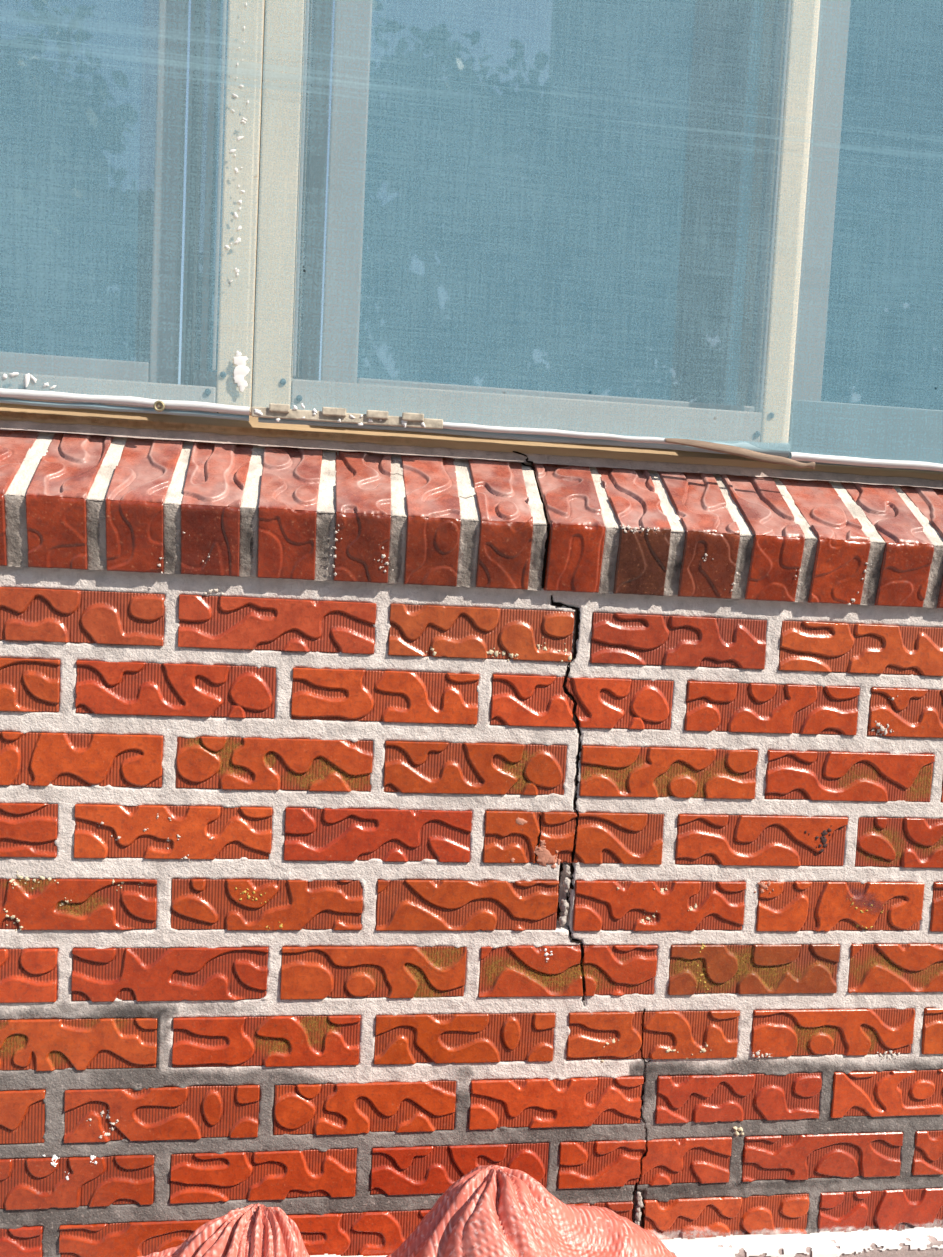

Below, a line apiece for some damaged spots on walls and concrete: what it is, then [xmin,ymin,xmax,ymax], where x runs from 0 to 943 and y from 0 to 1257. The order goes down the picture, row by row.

crack [513,451,586,1001]
crack [632,1009,651,1228]